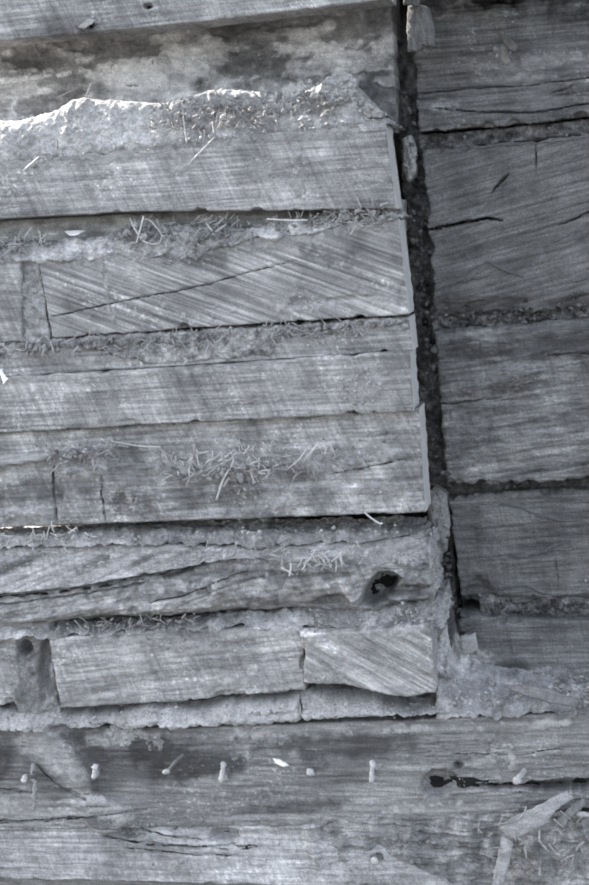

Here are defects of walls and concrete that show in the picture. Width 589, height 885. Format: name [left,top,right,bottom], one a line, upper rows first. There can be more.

crack [55,263,285,316]
crack [0,562,206,599]
crack [151,570,248,603]